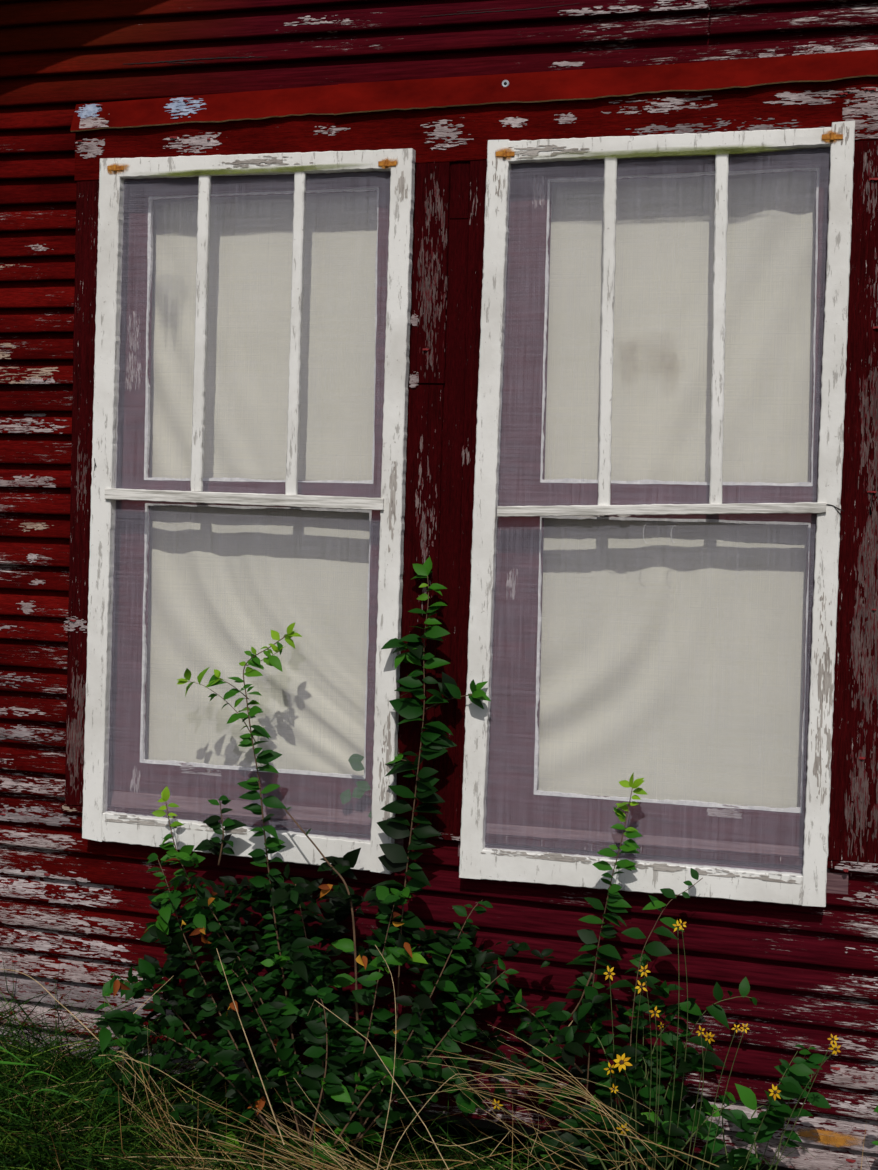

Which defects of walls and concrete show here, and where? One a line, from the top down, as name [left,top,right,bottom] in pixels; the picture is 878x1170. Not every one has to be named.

peeling [557,0,708,32]
peeling [759,40,878,58]
peeling [164,97,206,119]
peeling [163,132,222,154]
peeling [420,117,474,150]
peeling [601,87,878,217]
peeling [0,343,59,384]
peeling [0,414,67,434]
peeling [0,474,55,487]
peeling [835,348,878,873]
peeling [811,592,834,804]
peeling [684,1036,878,1170]